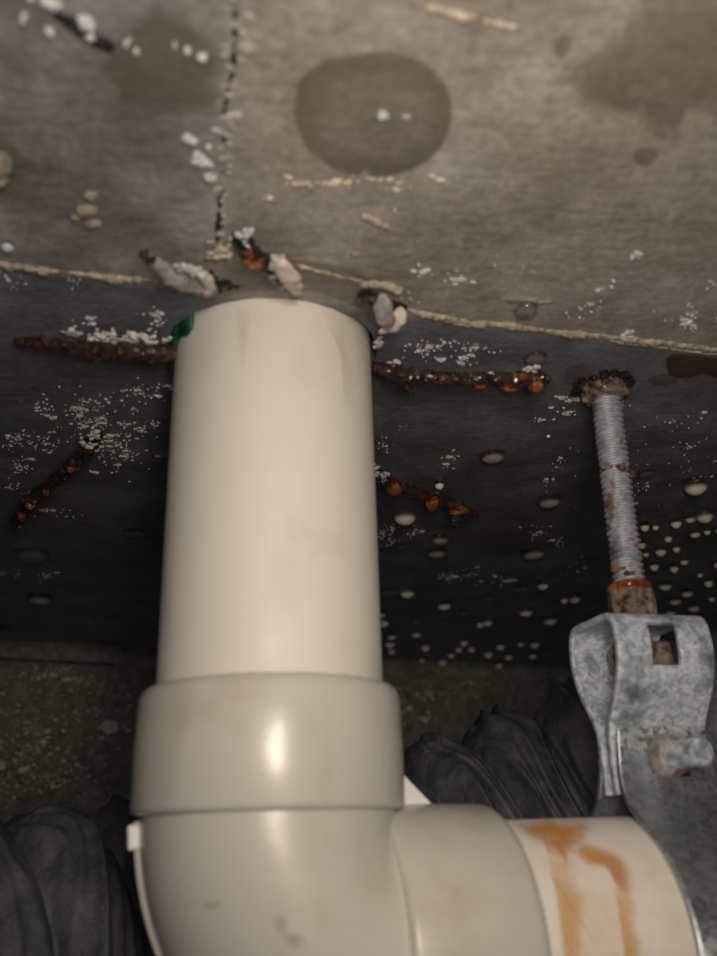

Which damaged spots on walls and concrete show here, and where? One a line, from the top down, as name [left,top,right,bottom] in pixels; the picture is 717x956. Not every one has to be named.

water stain [301,54,451,133]
crack [206,0,260,261]
water stain [283,113,431,192]
peeling [172,263,216,296]
peeling [266,254,304,296]
peeling [378,307,407,334]
water stain [667,354,717,378]
water stain [2,377,173,495]
water stain [375,463,390,482]
crack [0,657,114,665]